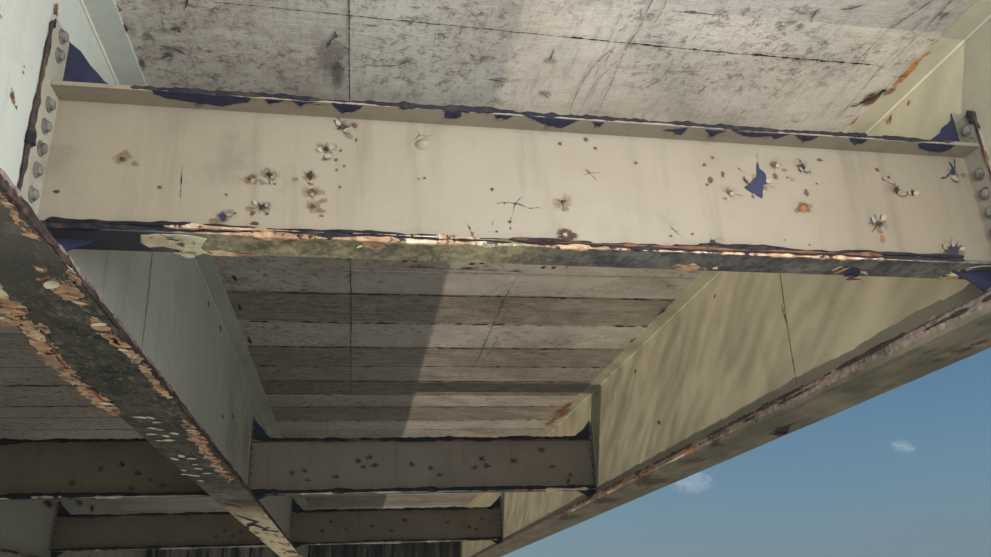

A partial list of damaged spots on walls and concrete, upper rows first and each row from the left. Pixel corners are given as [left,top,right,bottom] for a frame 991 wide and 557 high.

corrosion [884,41,937,96]
peeling [727,156,774,198]
corrosion [965,110,991,180]
corrosion [0,18,597,550]
peeling [140,212,630,258]
corrosion [41,217,965,262]
peeling [643,250,914,271]
corrosion [832,266,868,281]
peeling [0,284,122,416]
peeling [90,317,173,399]
peeling [134,416,235,482]
corrosion [475,288,991,557]